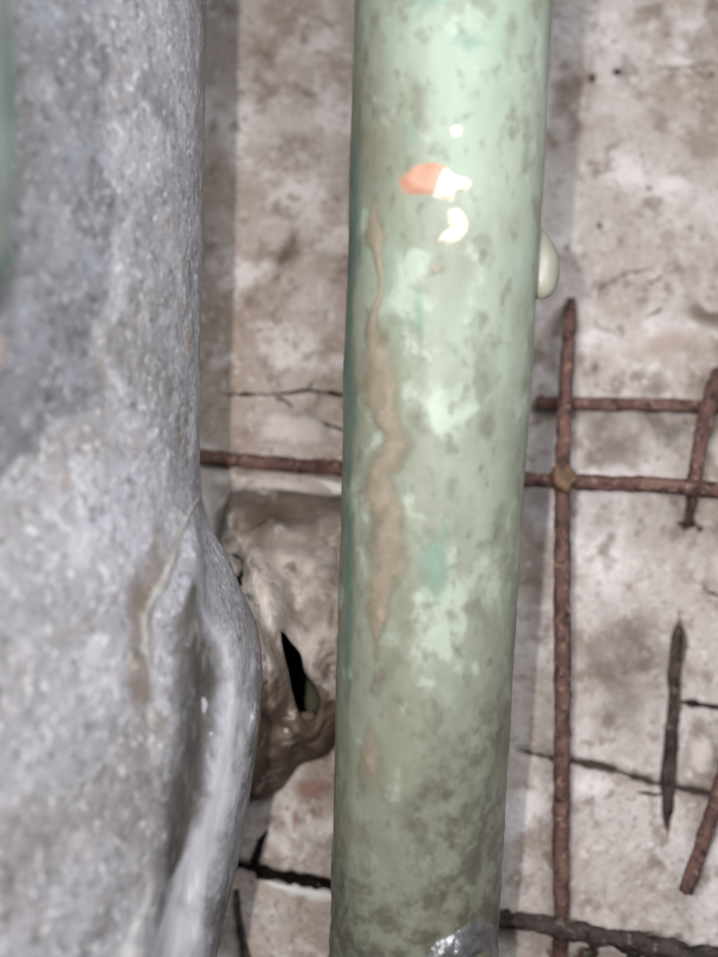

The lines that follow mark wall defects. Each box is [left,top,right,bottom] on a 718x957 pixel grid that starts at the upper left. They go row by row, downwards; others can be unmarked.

crack [222,381,343,431]